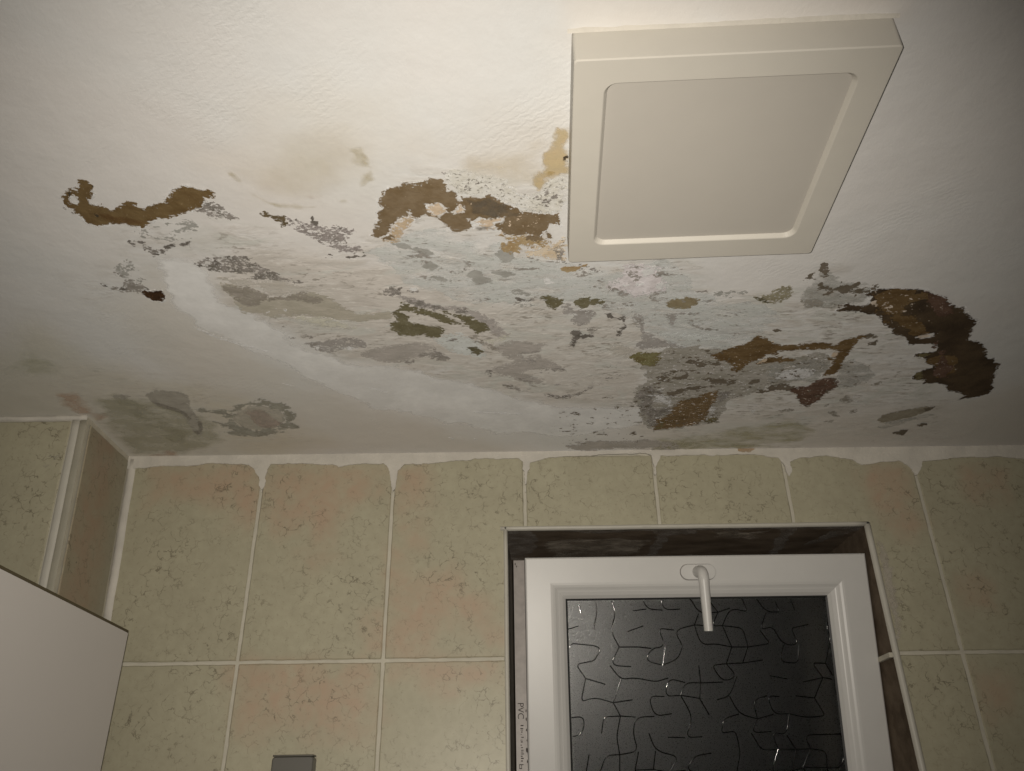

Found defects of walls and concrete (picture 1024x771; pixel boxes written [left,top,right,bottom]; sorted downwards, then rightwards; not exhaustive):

damp [534,128,568,189]
peeling [60,179,239,257]
flaking render [100,259,167,303]
peeling [194,255,304,284]
peeling [259,169,700,347]
peeling [282,286,511,364]
peeling [629,262,1002,432]
damp [102,398,299,451]